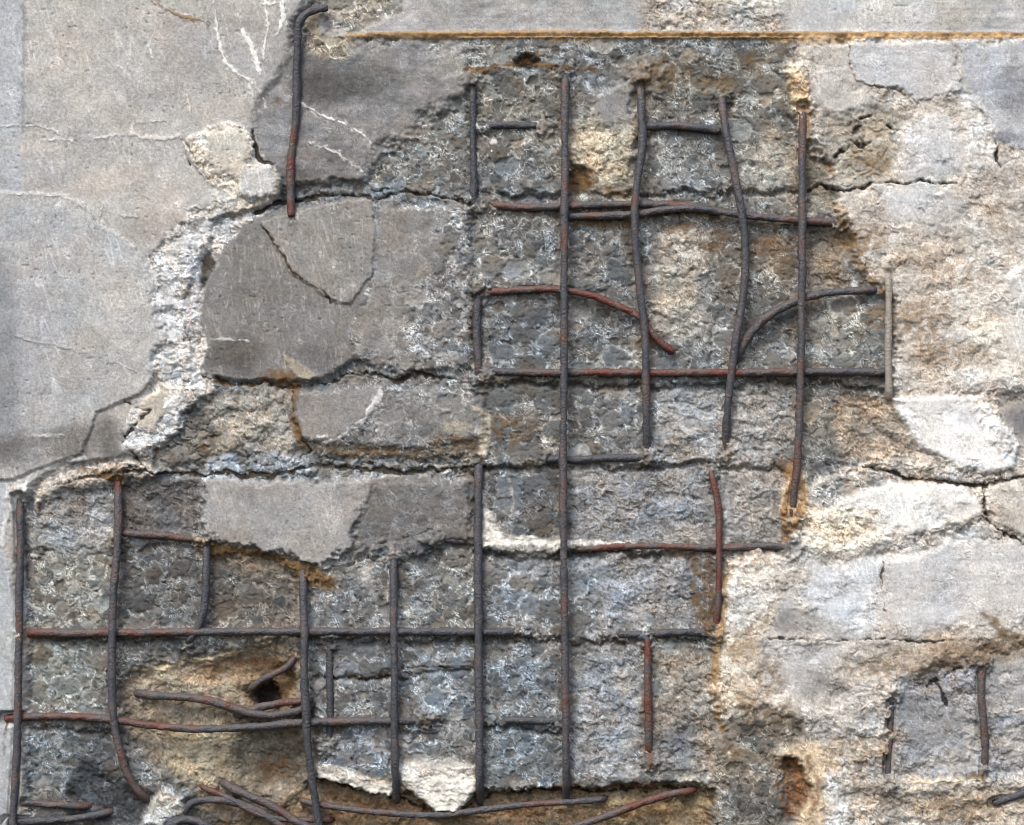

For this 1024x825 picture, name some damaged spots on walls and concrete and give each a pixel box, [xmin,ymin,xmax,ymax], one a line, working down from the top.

crack [158,0,291,108]
rust [345,30,1024,43]
crack [252,102,472,304]
rust [578,172,625,197]
crack [806,179,949,193]
spalling [790,105,1019,508]
crack [53,369,486,485]
spalling [122,0,891,825]
rust [780,460,807,541]
crack [828,462,1024,545]
spalling [4,466,609,825]
rust [690,552,729,731]